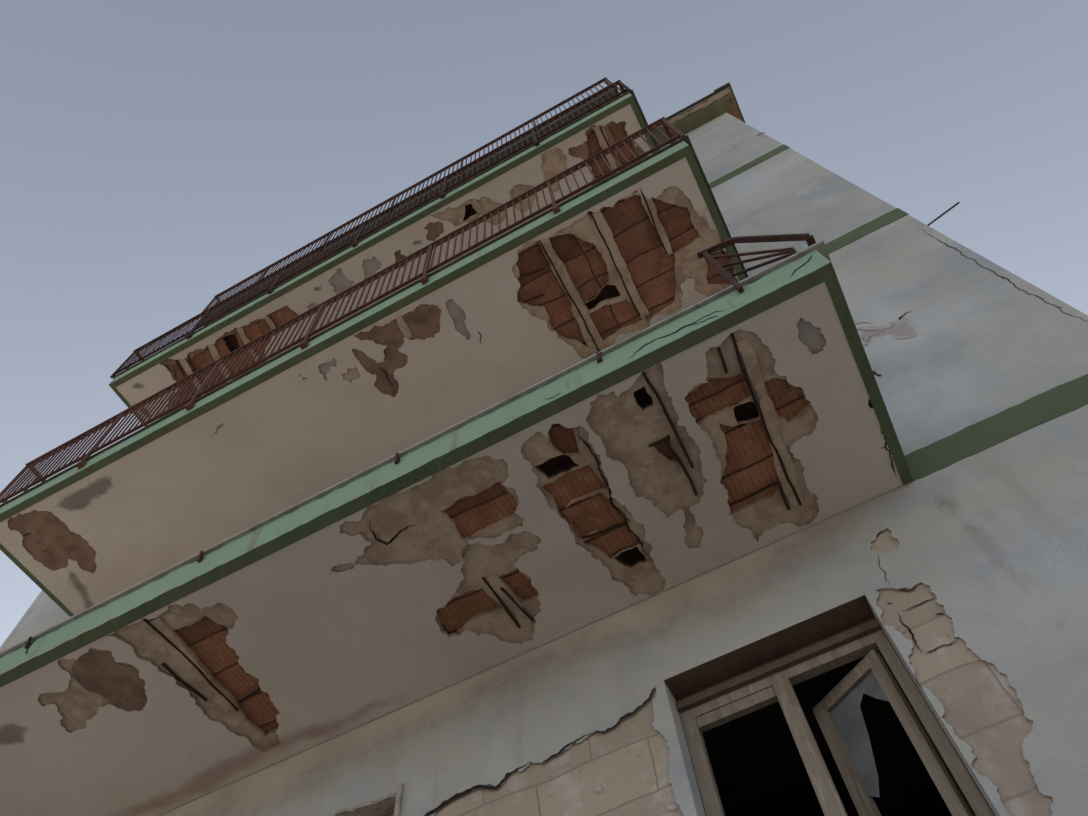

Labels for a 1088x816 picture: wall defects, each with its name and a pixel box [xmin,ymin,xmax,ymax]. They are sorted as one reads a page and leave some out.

flaking render [413,121,647,246]
flaking render [159,306,299,418]
flaking render [319,299,471,397]
flaking render [512,186,738,358]
flaking render [796,318,826,353]
crack [930,235,1086,321]
flaking render [521,330,819,594]
flaking render [8,510,97,572]
flaking render [332,455,541,642]
flaking render [39,602,280,750]
flaking render [436,690,684,816]
flaking render [877,584,1053,816]